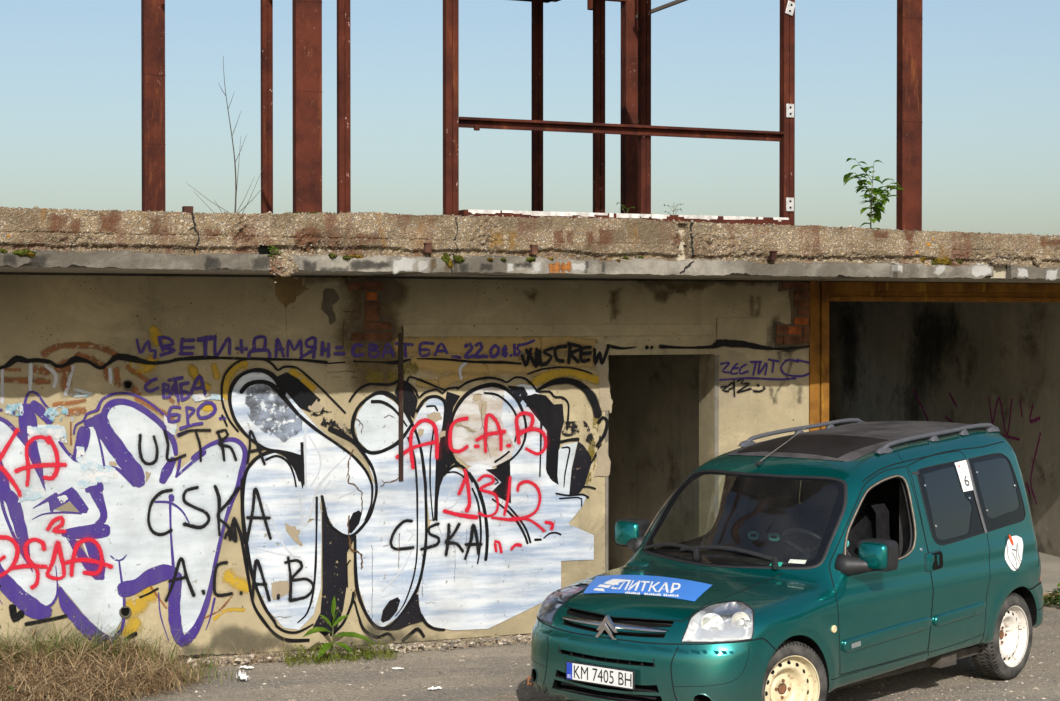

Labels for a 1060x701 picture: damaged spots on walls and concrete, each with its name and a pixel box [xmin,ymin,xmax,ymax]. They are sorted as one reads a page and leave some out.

crack [189,213,200,253]
flaking render [269,251,309,307]
flaking render [321,276,403,346]
water stain [339,288,404,386]
water stain [304,249,541,280]
flaking render [774,280,810,352]